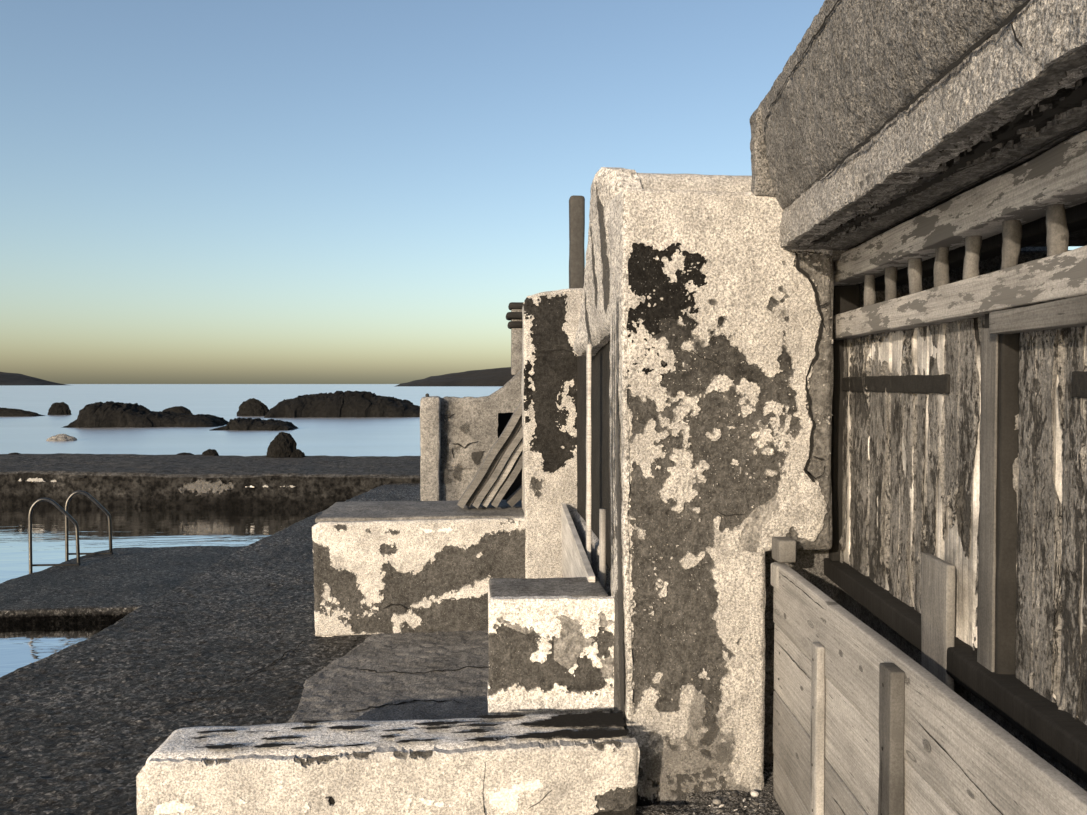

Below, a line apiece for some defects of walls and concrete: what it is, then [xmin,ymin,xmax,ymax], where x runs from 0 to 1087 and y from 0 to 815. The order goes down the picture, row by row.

flaking render [782,68,1087,281]
flaking render [523,294,577,499]
flaking render [313,519,614,696]
flaking render [591,285,830,815]
spalling [294,751,375,767]
spalling [393,747,433,759]
spalling [576,740,623,751]